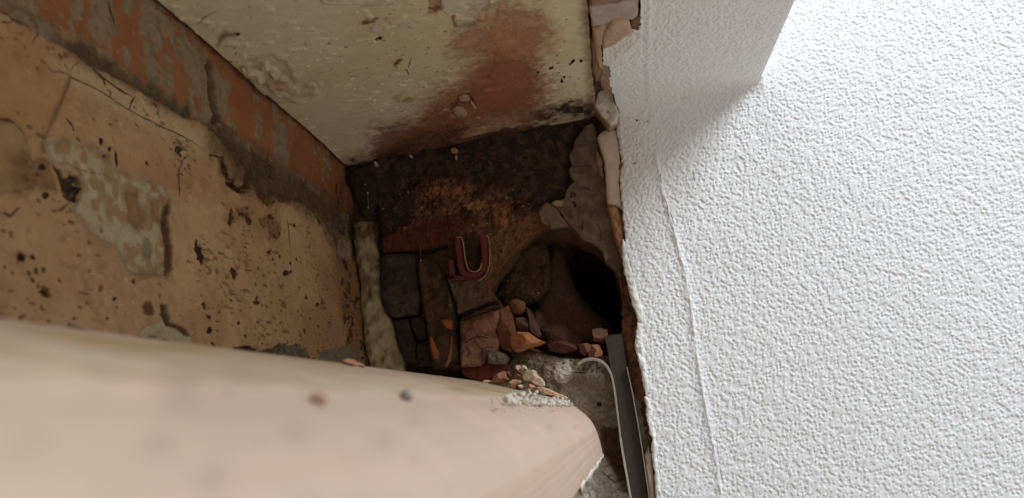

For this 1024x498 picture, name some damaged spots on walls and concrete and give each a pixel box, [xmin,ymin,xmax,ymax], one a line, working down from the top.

crack [1,12,227,197]
corrosion [345,0,552,166]
peeling [35,138,172,284]
peeling [429,335,439,359]
spalling [441,91,661,498]